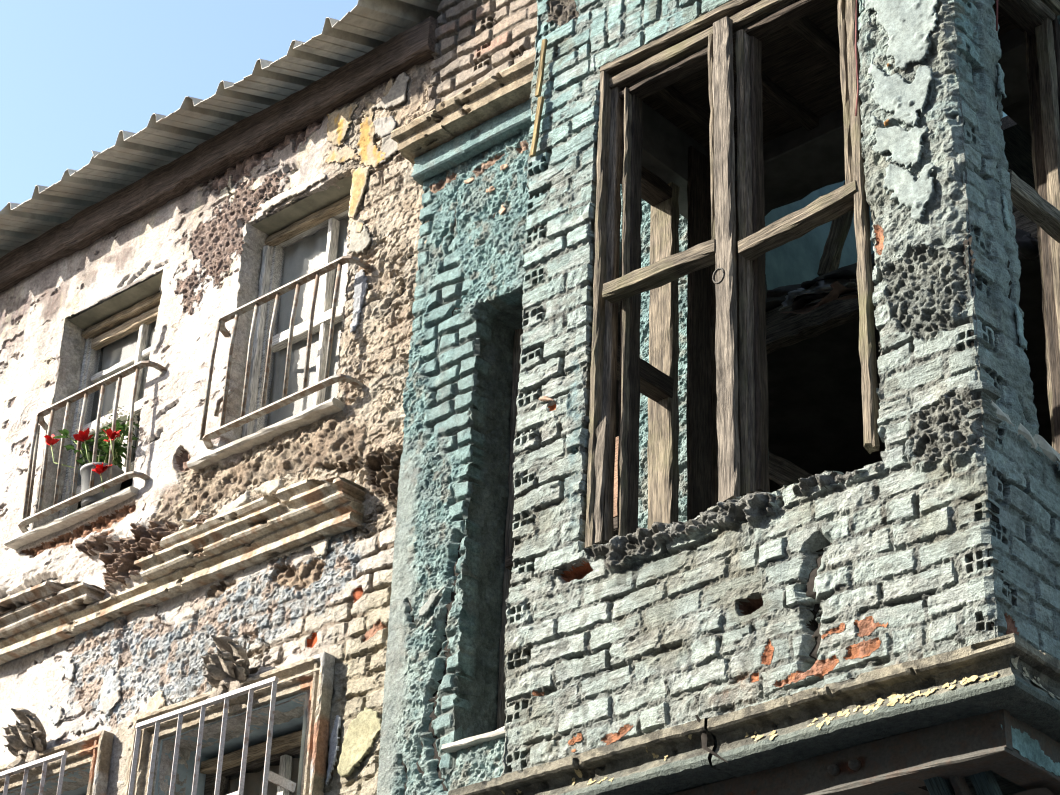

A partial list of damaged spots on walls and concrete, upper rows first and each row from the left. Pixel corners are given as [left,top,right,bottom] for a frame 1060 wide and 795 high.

flaking render [862,0,939,221]
flaking render [172,72,409,315]
flaking render [19,505,136,558]
flaking render [206,580,236,599]
flaking render [267,536,331,590]
flaking render [353,587,363,603]
crack [804,543,832,660]
peeling [48,666,121,735]
flaking render [307,632,317,648]
crack [401,538,463,795]
flaking render [750,640,774,682]
flaking render [773,616,888,687]